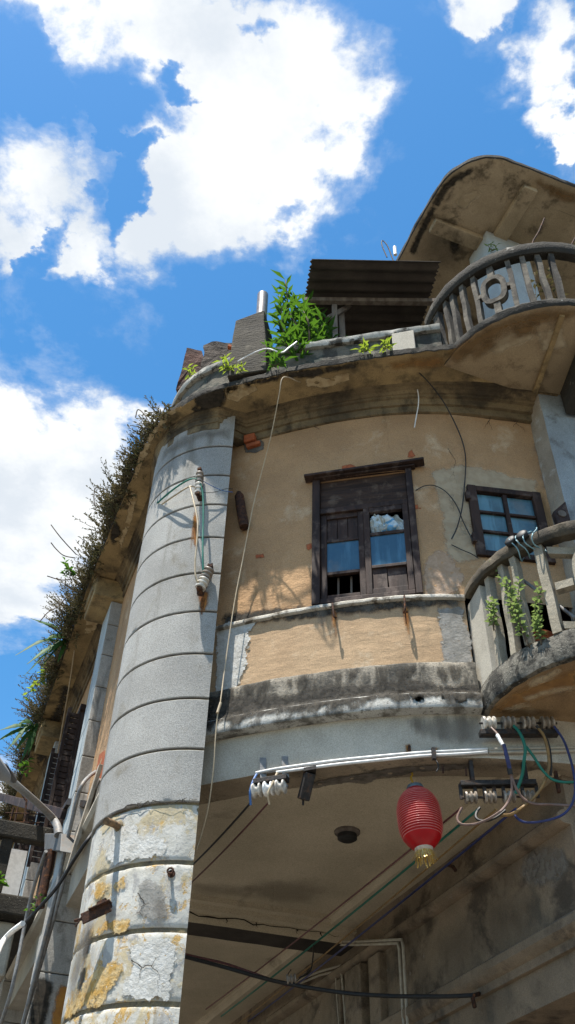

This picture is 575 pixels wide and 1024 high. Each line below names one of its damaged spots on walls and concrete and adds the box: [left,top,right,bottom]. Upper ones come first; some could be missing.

water stain [410,169,473,254]
corrosion [199,592,208,614]
peeling [215,622,256,691]
water stain [206,665,484,730]
peeling [105,824,167,866]
peeling [87,877,168,939]
peeling [65,938,177,1019]